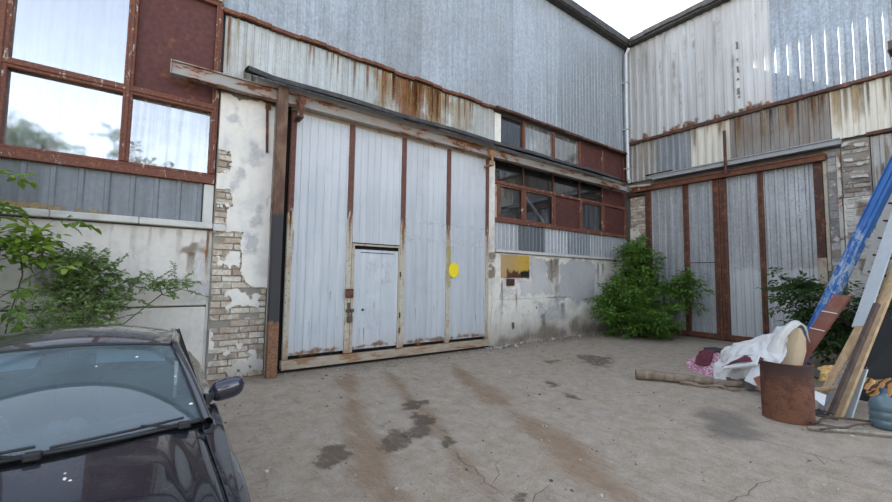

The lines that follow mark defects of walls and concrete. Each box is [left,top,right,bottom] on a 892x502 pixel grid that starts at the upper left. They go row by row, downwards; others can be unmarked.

corrosion [367,66,473,129]
corrosion [663,82,870,133]
flaking render [217,150,232,173]
flaking render [206,187,266,381]